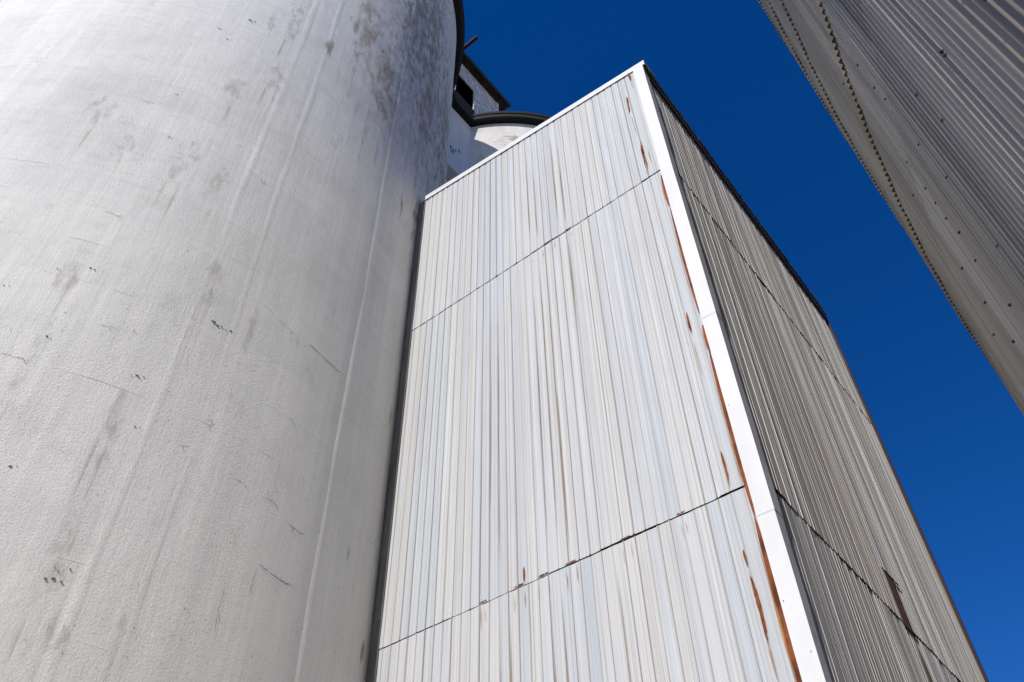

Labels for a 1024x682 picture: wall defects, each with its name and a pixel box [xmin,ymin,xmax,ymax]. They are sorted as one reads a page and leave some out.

damp [403,1,448,185]
corrosion [490,325,499,535]
corrosion [661,175,802,682]